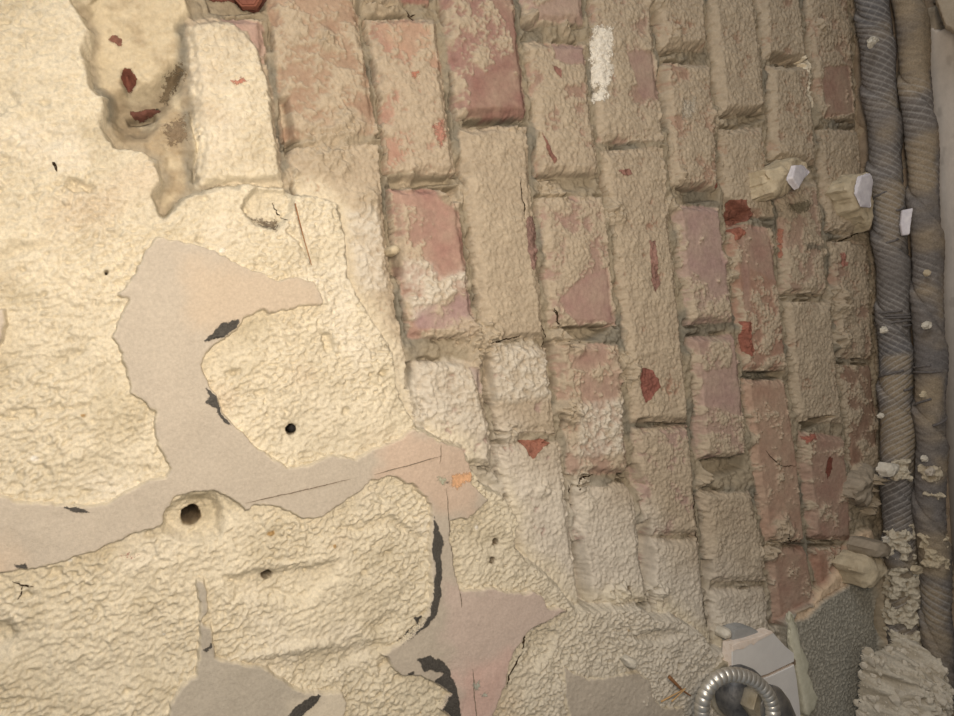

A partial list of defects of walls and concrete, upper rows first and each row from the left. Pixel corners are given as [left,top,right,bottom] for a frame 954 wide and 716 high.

leakage [588,24,614,104]
flaking render [0,237,567,716]
spalling [76,0,890,652]